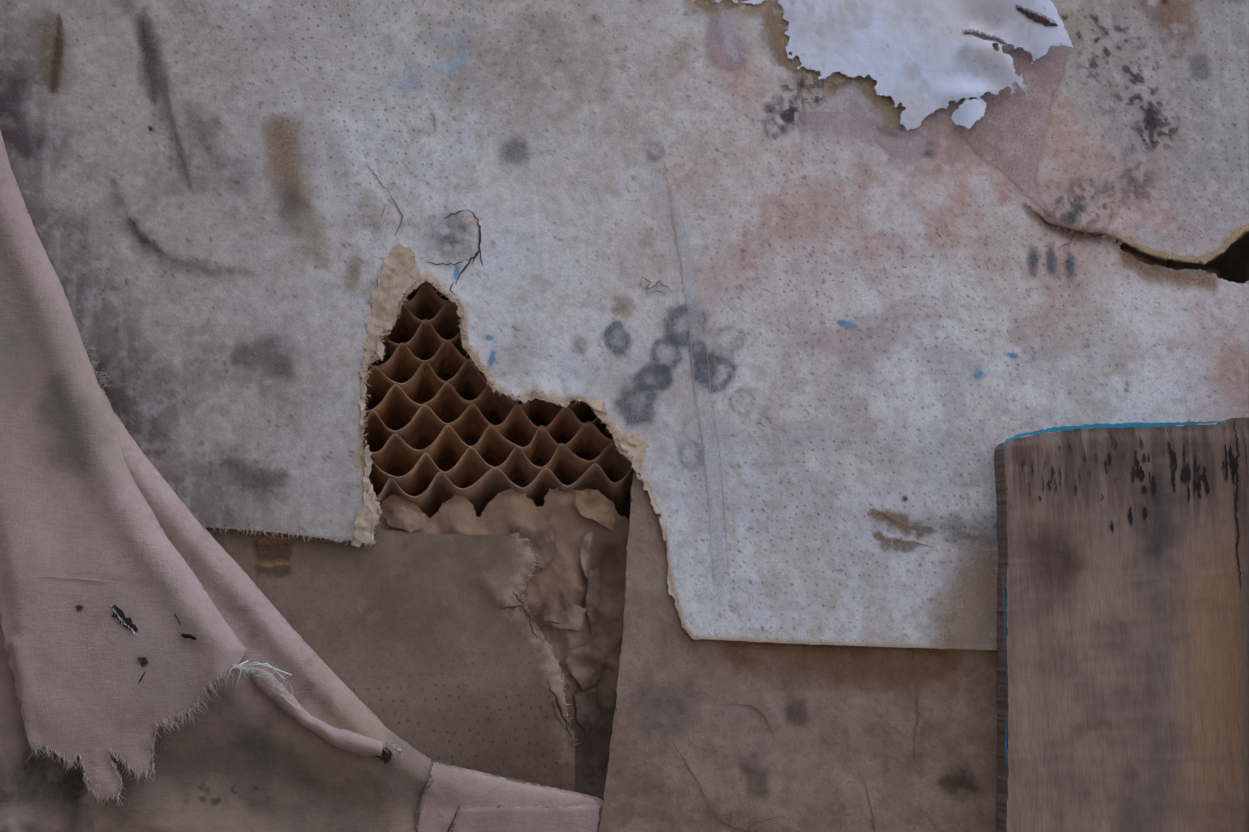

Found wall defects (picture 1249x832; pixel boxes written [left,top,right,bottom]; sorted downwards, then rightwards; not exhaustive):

peeling [694,0,1073,229]
crack [1024,205,1249,288]
peeling [352,244,497,547]
water stain [605,306,630,354]
water stain [616,306,735,424]
peeling [517,390,668,544]
crack [671,739,799,832]